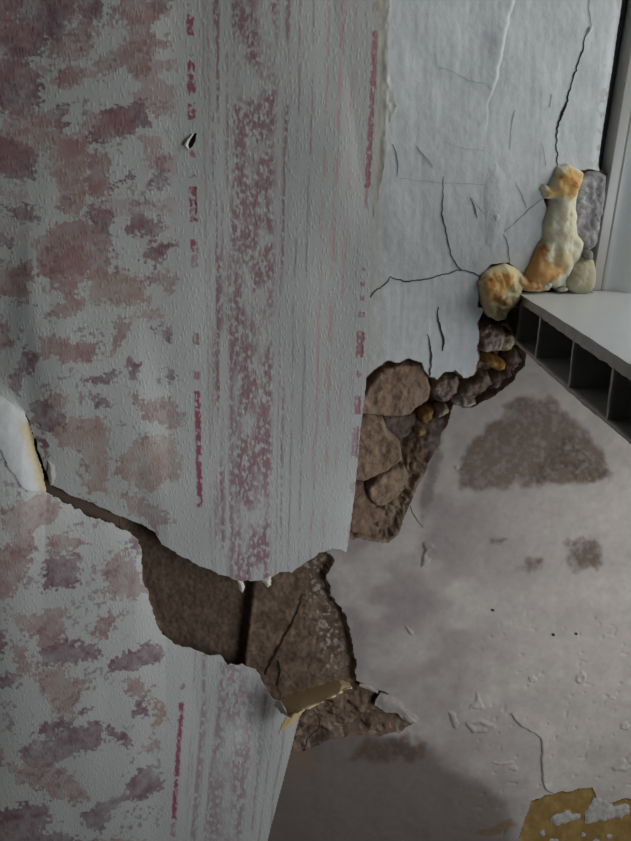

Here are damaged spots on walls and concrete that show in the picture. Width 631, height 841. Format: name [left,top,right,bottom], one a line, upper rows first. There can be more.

crack [555,0,593,166]
crack [370,176,480,298]
crack [427,307,445,376]
flaking render [349,290,528,543]
damp [461,398,608,490]
flaking render [119,516,418,752]
peeling [510,706,631,841]